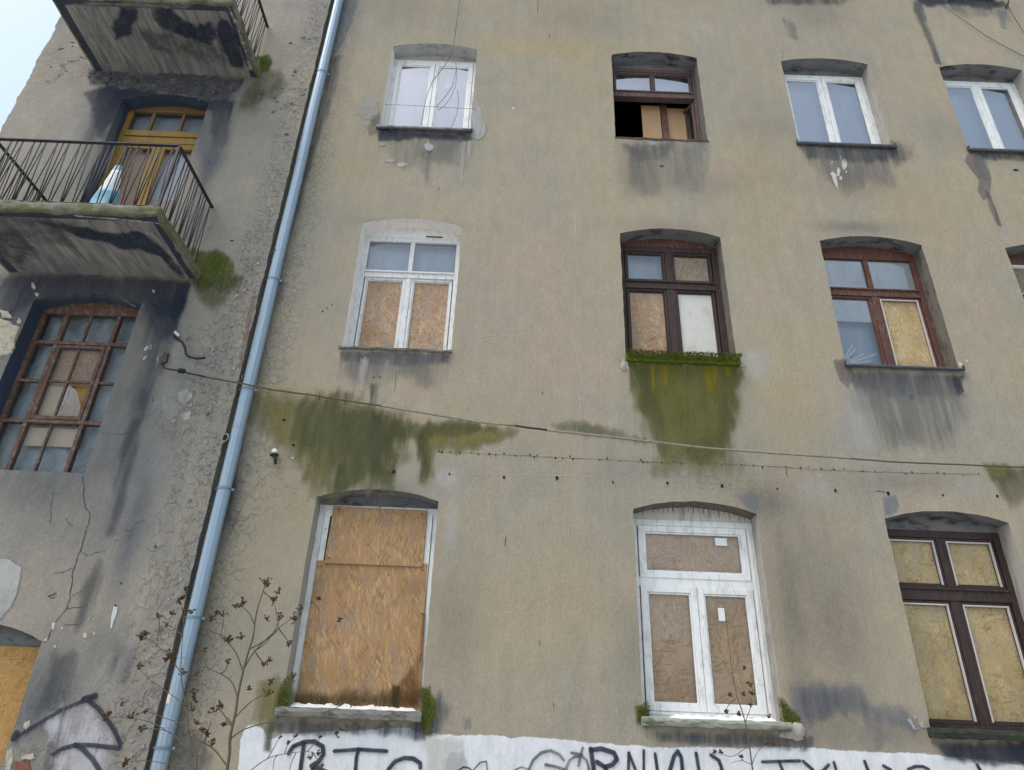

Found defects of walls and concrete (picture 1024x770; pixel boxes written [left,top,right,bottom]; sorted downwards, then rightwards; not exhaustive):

peeling [830,155,847,189]
leakage [966,153,1001,226]
peeling [0,310,22,357]
leakage [834,358,958,439]
leakage [301,401,396,491]
crack [47,476,142,640]